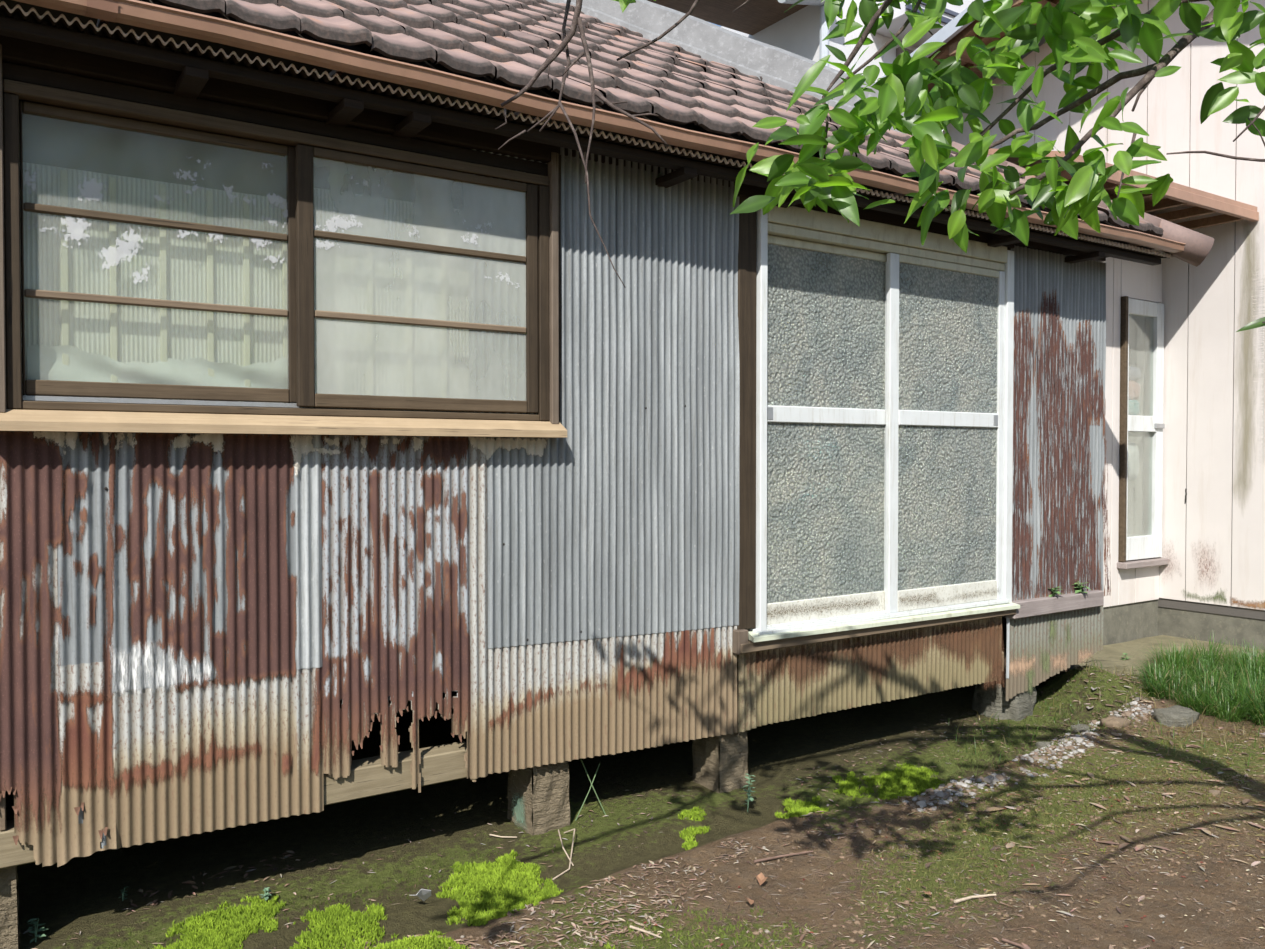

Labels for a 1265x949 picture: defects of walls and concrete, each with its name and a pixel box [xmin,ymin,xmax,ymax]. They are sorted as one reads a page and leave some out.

corrosion [1012,290,1111,601]
corrosion [0,431,297,833]
corrosion [311,435,471,775]
corrosion [575,628,731,699]
corrosion [747,621,1003,686]
peeling [351,713,381,756]
peeling [396,706,446,745]
corrosion [490,686,559,731]